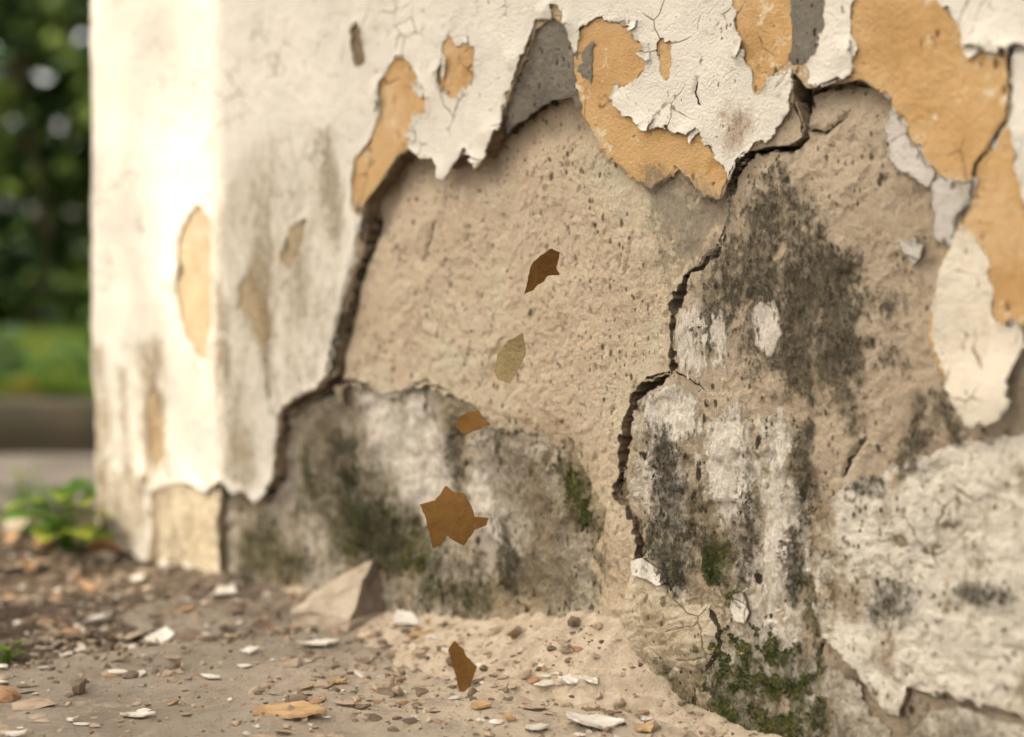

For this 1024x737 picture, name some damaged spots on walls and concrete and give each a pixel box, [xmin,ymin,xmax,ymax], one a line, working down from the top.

crack [685,76,879,279]
peeling [173,203,212,366]
crack [265,209,450,506]
leakage [313,387,572,606]
spalling [212,0,1024,737]
crack [643,371,705,397]
leakage [637,164,907,611]
leakage [866,577,914,633]
leakage [897,383,964,481]
leakage [952,580,1016,607]